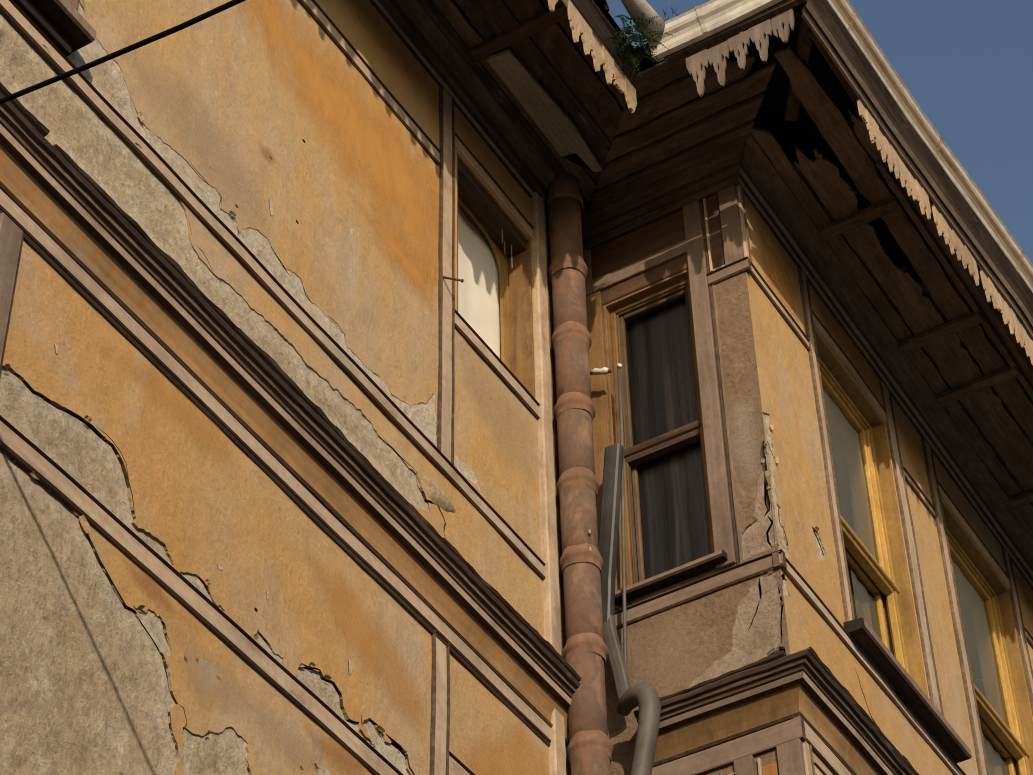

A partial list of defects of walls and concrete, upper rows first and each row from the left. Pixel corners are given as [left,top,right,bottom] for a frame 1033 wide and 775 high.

spalling [0,13,437,513]
spalling [0,364,223,611]
crack [763,452,773,547]
spalling [0,450,250,775]
spalling [254,630,283,665]
peeling [686,569,789,688]
spalling [296,662,409,775]